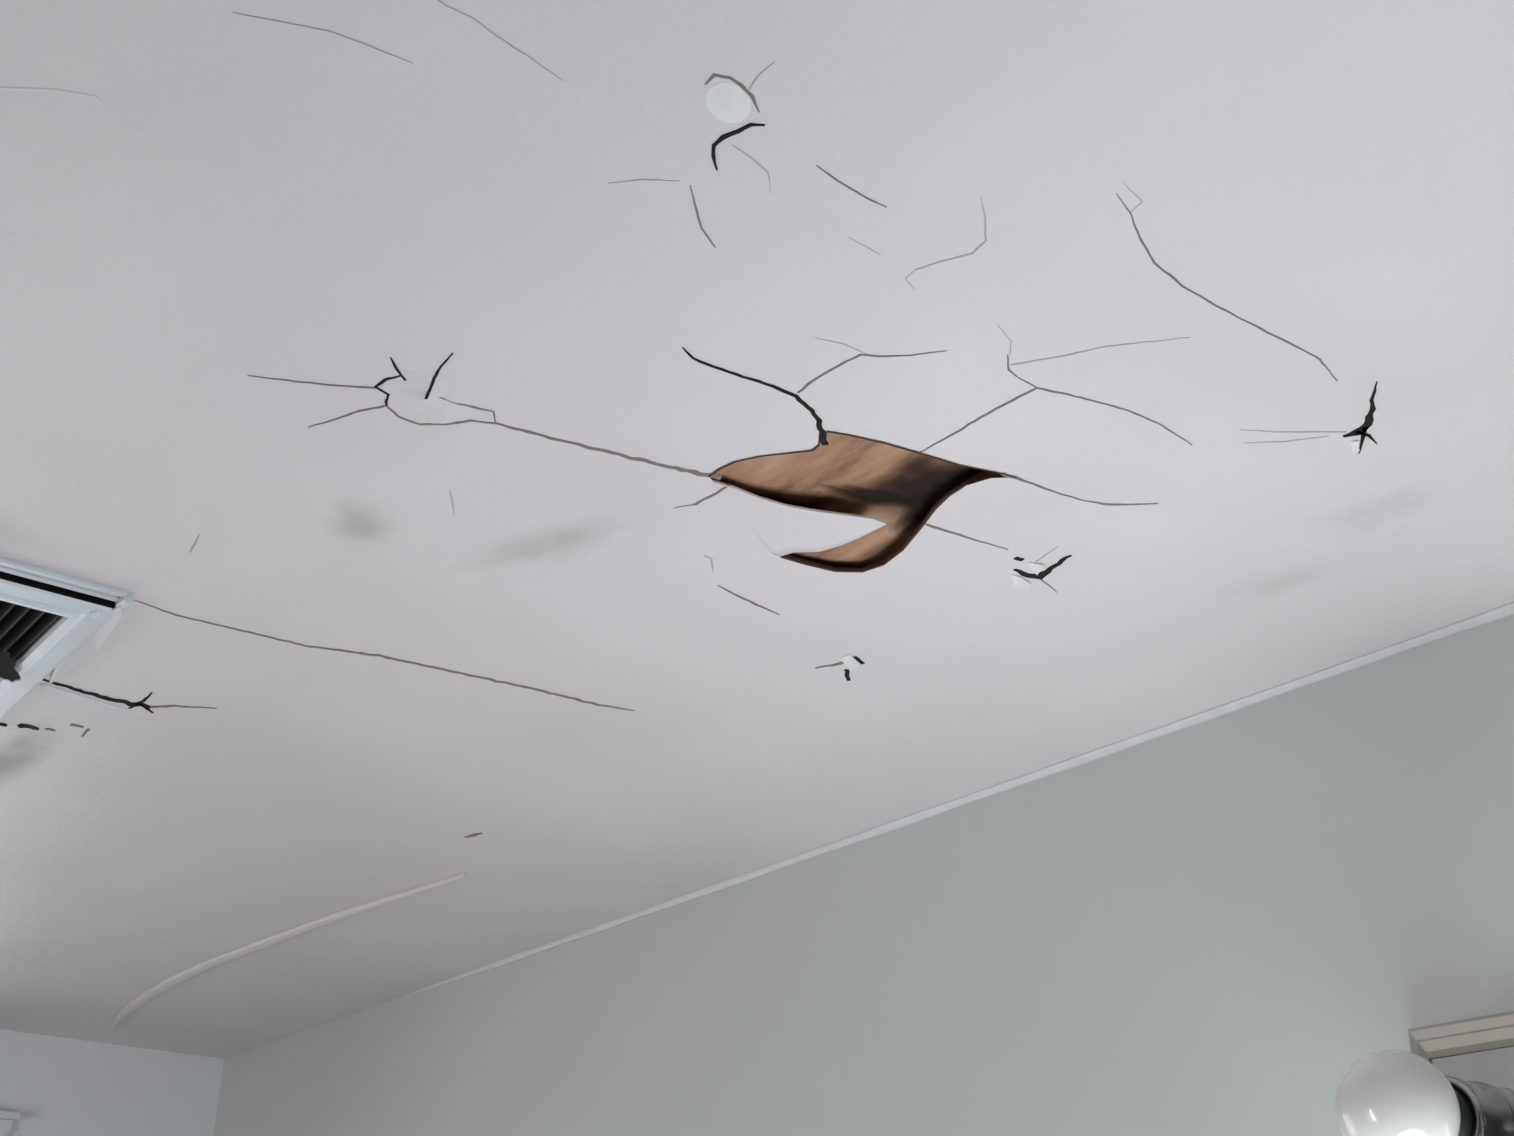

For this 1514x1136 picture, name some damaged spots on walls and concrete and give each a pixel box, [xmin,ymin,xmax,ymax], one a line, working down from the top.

crack [232,12,413,64]
crack [608,179,716,248]
crack [816,165,887,208]
crack [848,197,987,290]
crack [1116,182,1338,381]
crack [247,353,731,508]
crack [682,338,947,446]
crack [920,325,1192,452]
crack [1240,429,1346,443]
crack [1000,472,1158,506]
crack [39,679,217,713]
crack [134,600,634,711]